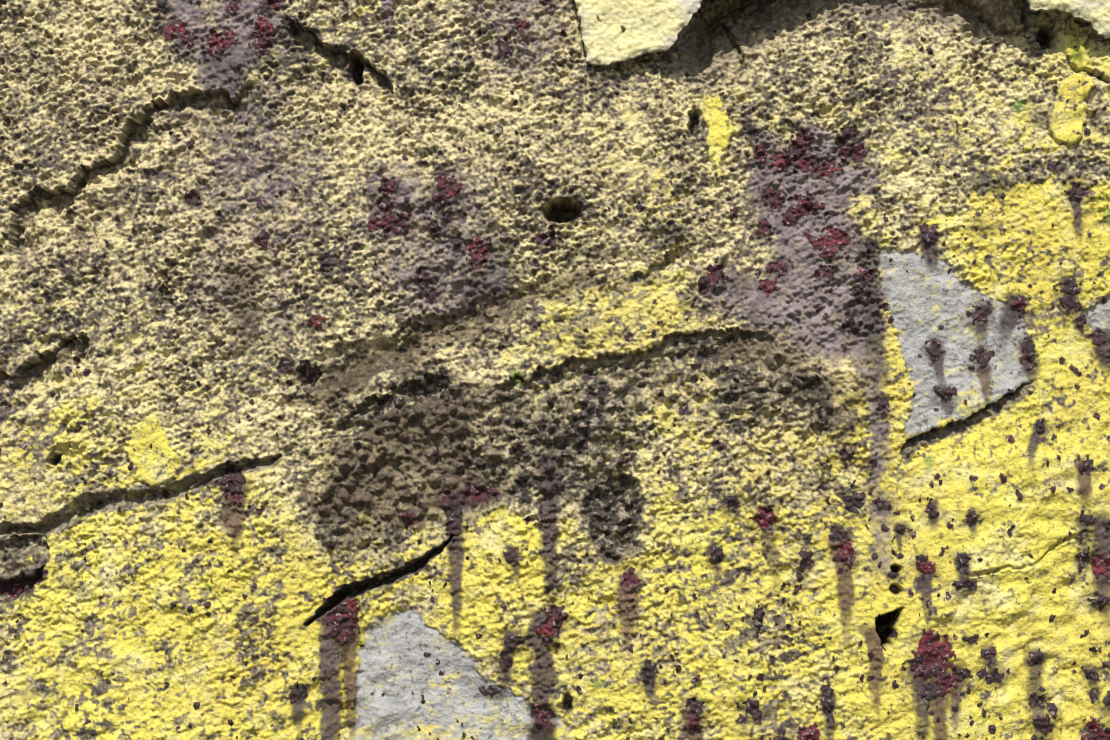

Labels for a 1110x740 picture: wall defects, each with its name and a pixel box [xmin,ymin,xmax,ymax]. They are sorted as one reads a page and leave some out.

spalling [280,12,396,115]
spalling [574,0,1110,179]
peeling [874,247,1037,462]
peeling [1085,292,1110,333]
crack [0,452,283,538]
leakage [319,397,480,541]
crack [302,535,453,627]
crack [969,528,1089,578]
peeling [350,607,582,740]